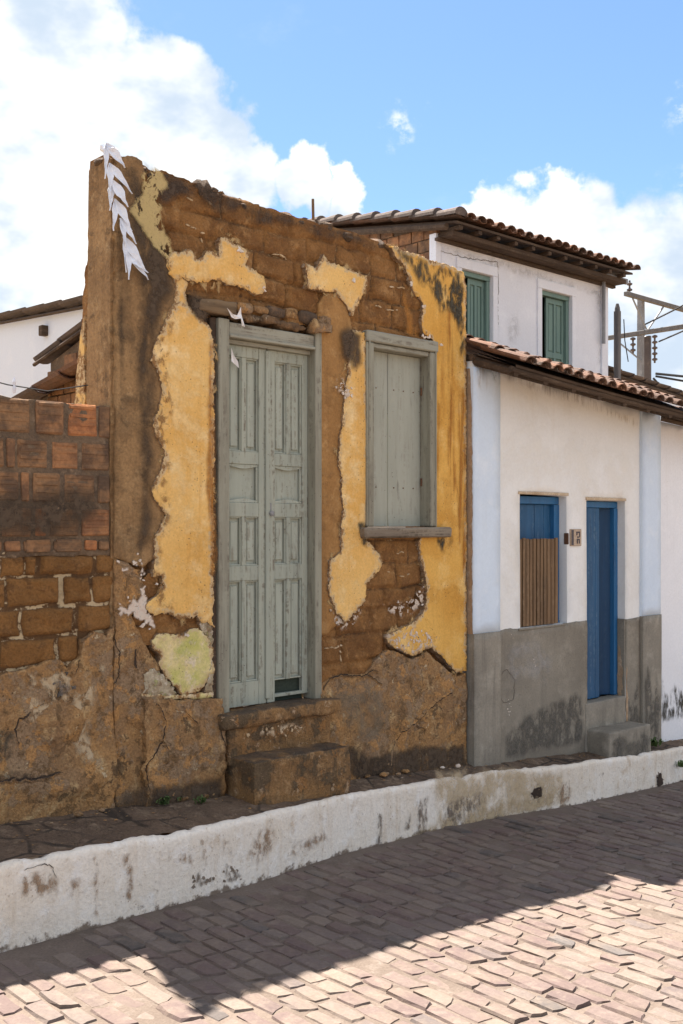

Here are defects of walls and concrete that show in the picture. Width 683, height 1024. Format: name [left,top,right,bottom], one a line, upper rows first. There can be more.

flaking render [130,166,443,346]
water stain [403,254,464,353]
water stain [342,330,361,367]
flaking render [116,553,199,645]
flaking render [322,538,432,682]
crack [113,637,137,684]
crack [323,670,382,690]
water stain [507,697,582,756]
water stain [614,669,683,756]
crack [0,771,62,784]